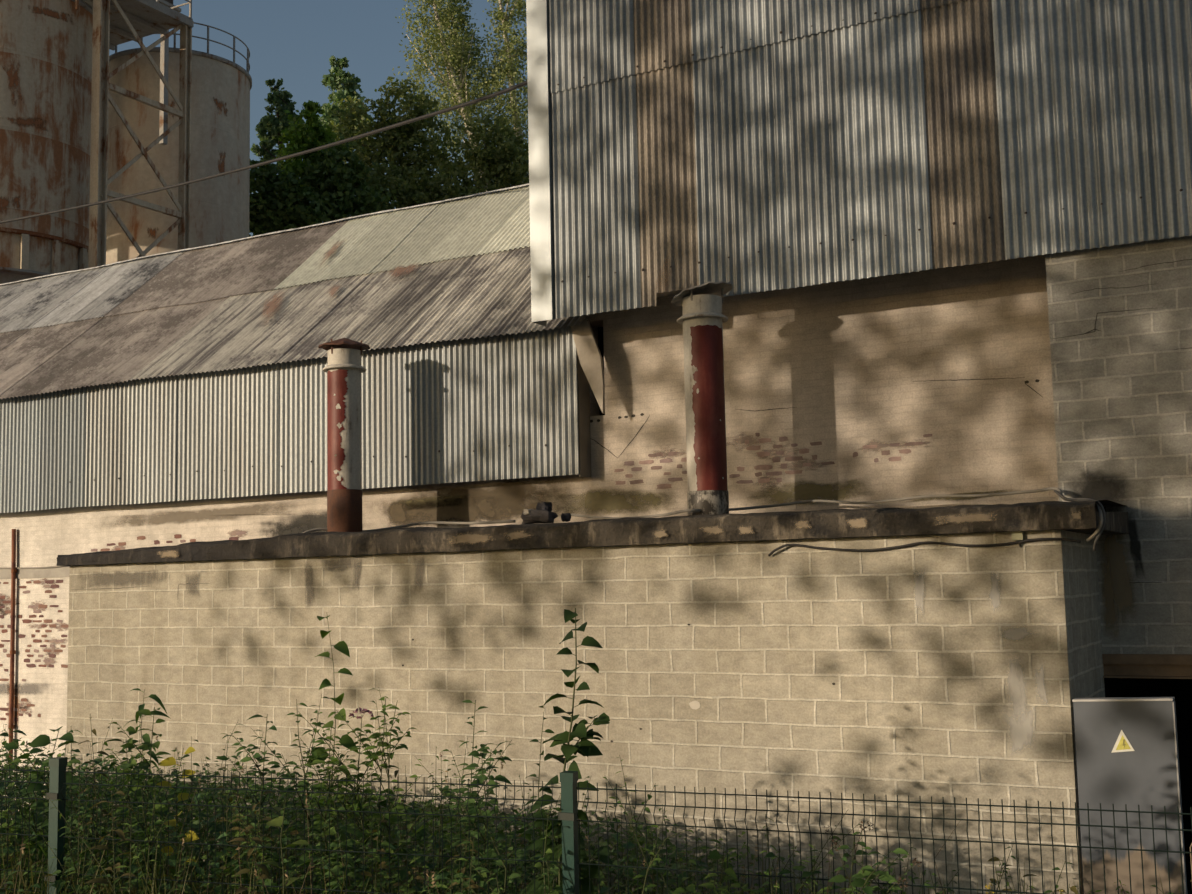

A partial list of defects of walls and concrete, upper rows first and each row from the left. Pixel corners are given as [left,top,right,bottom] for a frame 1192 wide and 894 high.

rust [33,7,72,23]
crack [1053,259,1192,339]
peeling [327,369,348,490]
peeling [614,325,835,491]
peeling [853,434,932,462]
water stain [1071,472,1125,512]
water stain [1128,519,1143,571]
peeling [0,578,69,682]
rust [8,686,18,726]
peeling [0,698,41,721]